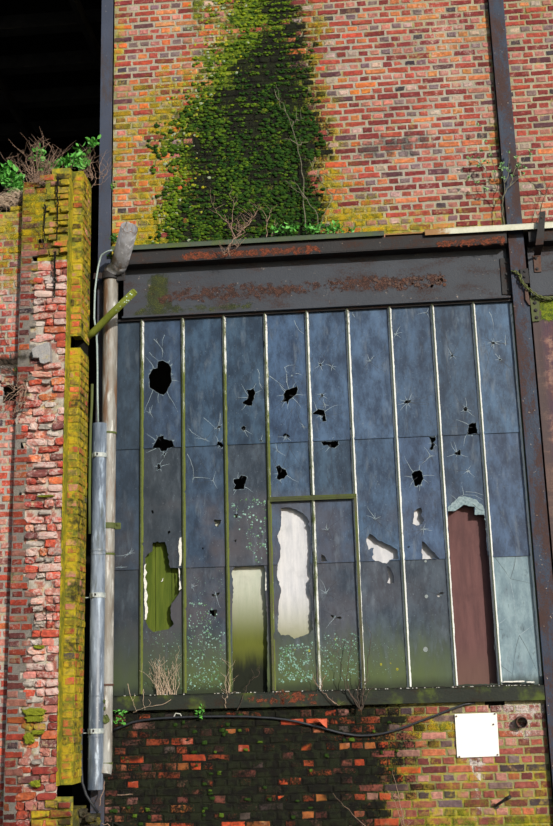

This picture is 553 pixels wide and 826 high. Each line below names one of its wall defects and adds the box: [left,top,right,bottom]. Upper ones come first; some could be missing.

rust [436,236,505,247]
rust [153,273,443,304]
spalling [0,260,68,826]
rust [249,690,317,704]